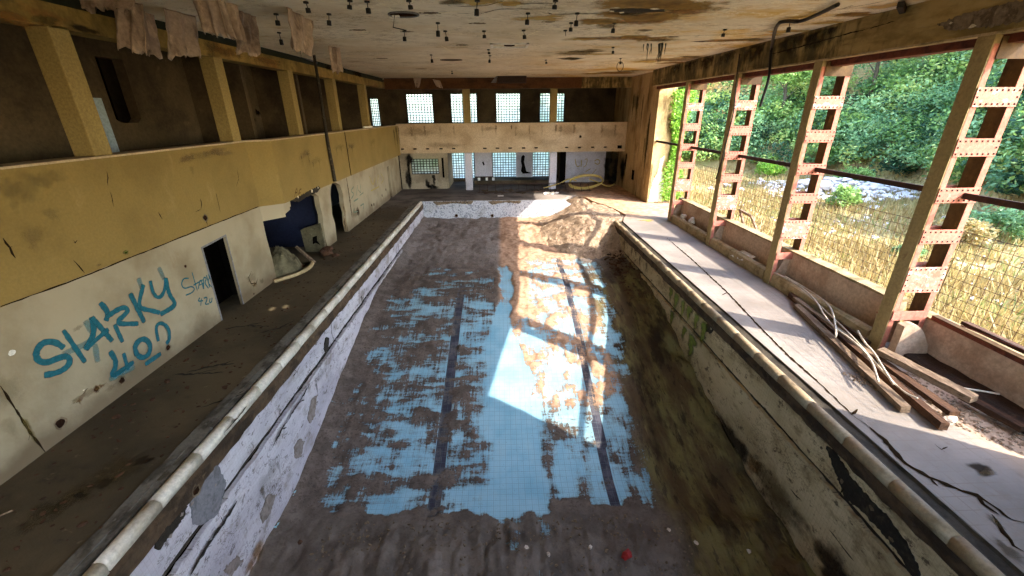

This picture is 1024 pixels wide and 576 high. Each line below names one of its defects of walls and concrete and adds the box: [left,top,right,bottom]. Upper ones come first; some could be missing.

leakage [558,0,729,60]
leakage [585,3,897,74]
crack [0,386,45,452]
crack [667,238,1024,552]
spalling [154,465,227,550]
spalling [807,446,921,576]